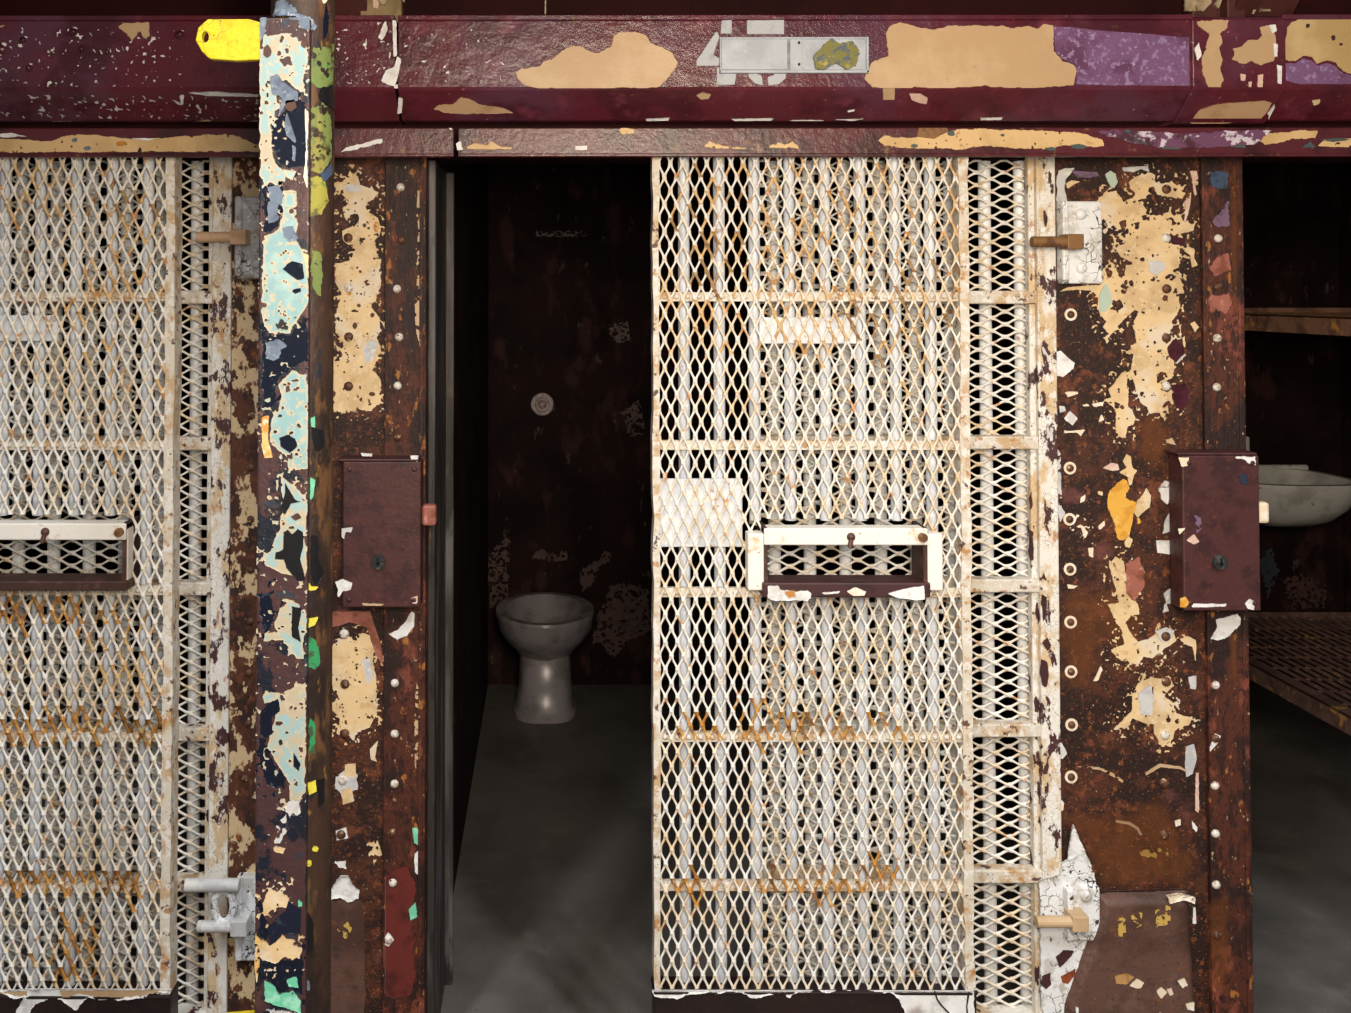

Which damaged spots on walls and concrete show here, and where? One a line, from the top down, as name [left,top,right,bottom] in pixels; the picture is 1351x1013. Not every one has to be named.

peeling [516,32,678,88]
peeling [0,0,418,854]
peeling [864,0,1351,832]
rust [0,595,162,747]
rust [675,711,723,740]
rust [730,697,859,754]
rust [865,711,907,740]
rust [670,865,705,907]
rust [756,851,899,907]
peeling [1038,824,1096,1013]
peeling [0,988,172,1013]
peeling [869,990,975,1013]